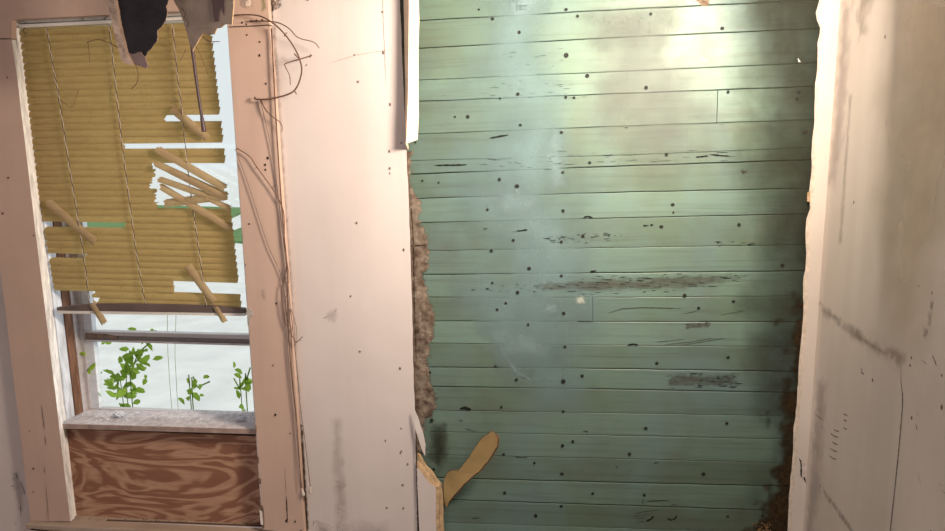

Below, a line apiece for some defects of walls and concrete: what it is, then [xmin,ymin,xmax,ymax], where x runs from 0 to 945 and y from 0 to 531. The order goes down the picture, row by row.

peeling [212,0,225,22]
peeling [404,0,419,149]
peeling [557,270,739,294]
peeling [414,409,426,455]